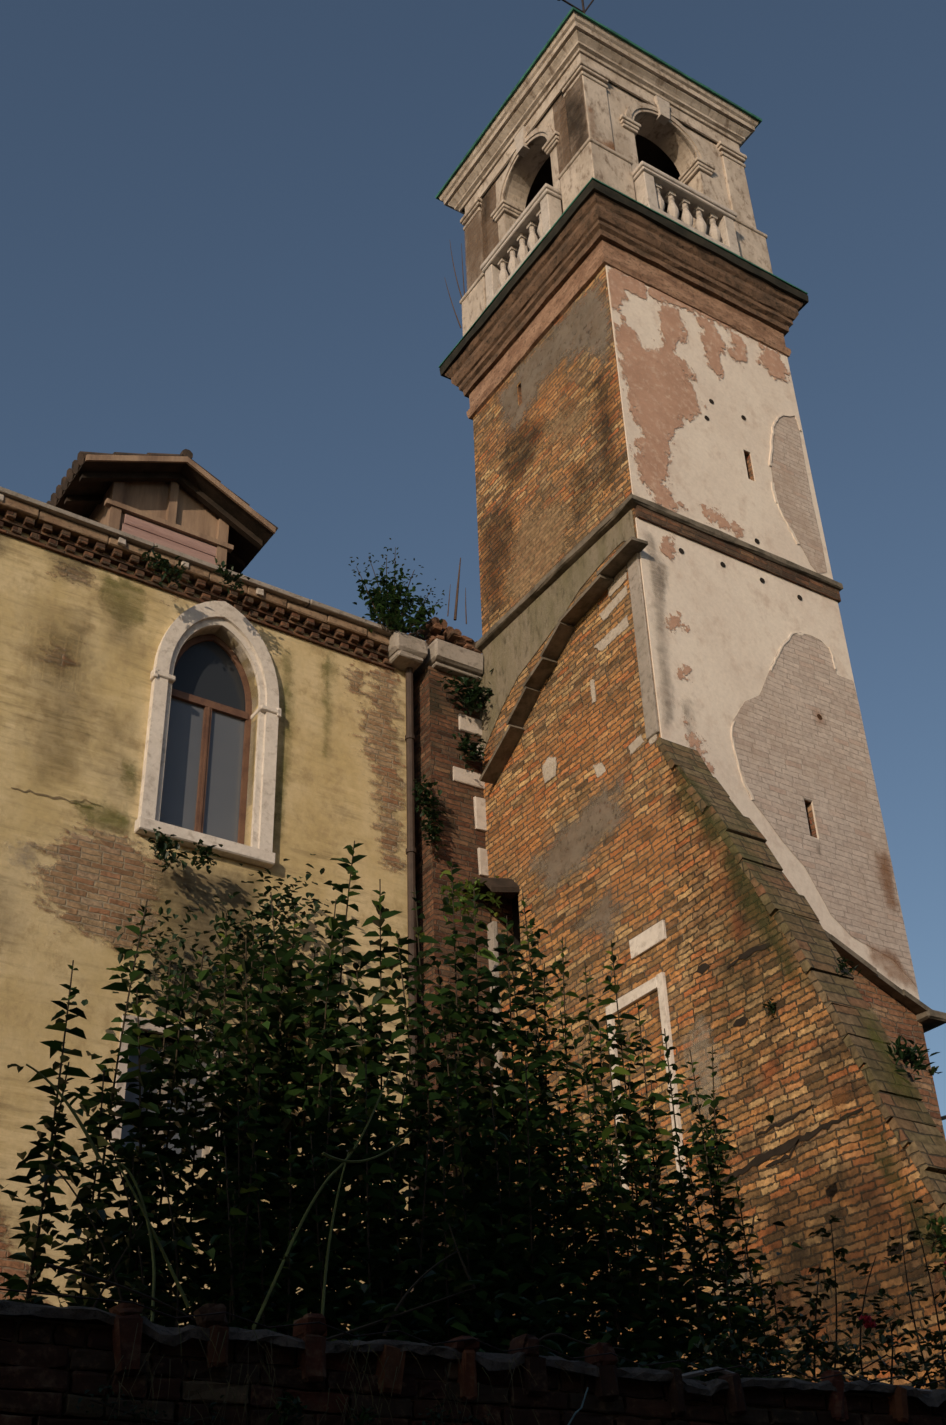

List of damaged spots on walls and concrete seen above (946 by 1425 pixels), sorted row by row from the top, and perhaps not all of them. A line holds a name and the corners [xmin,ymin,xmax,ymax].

flaking render [499,268,791,544]
flaking render [659,535,684,561]
flaking render [769,414,827,573]
peeling [479,503,635,752]
flaking render [666,611,690,634]
flaking render [344,660,406,874]
flaking render [542,757,557,783]
flaking render [593,762,606,777]
flaking render [628,734,657,755]
flaking render [731,631,918,989]
flaking render [25,822,167,953]
water stain [160,875,251,1010]